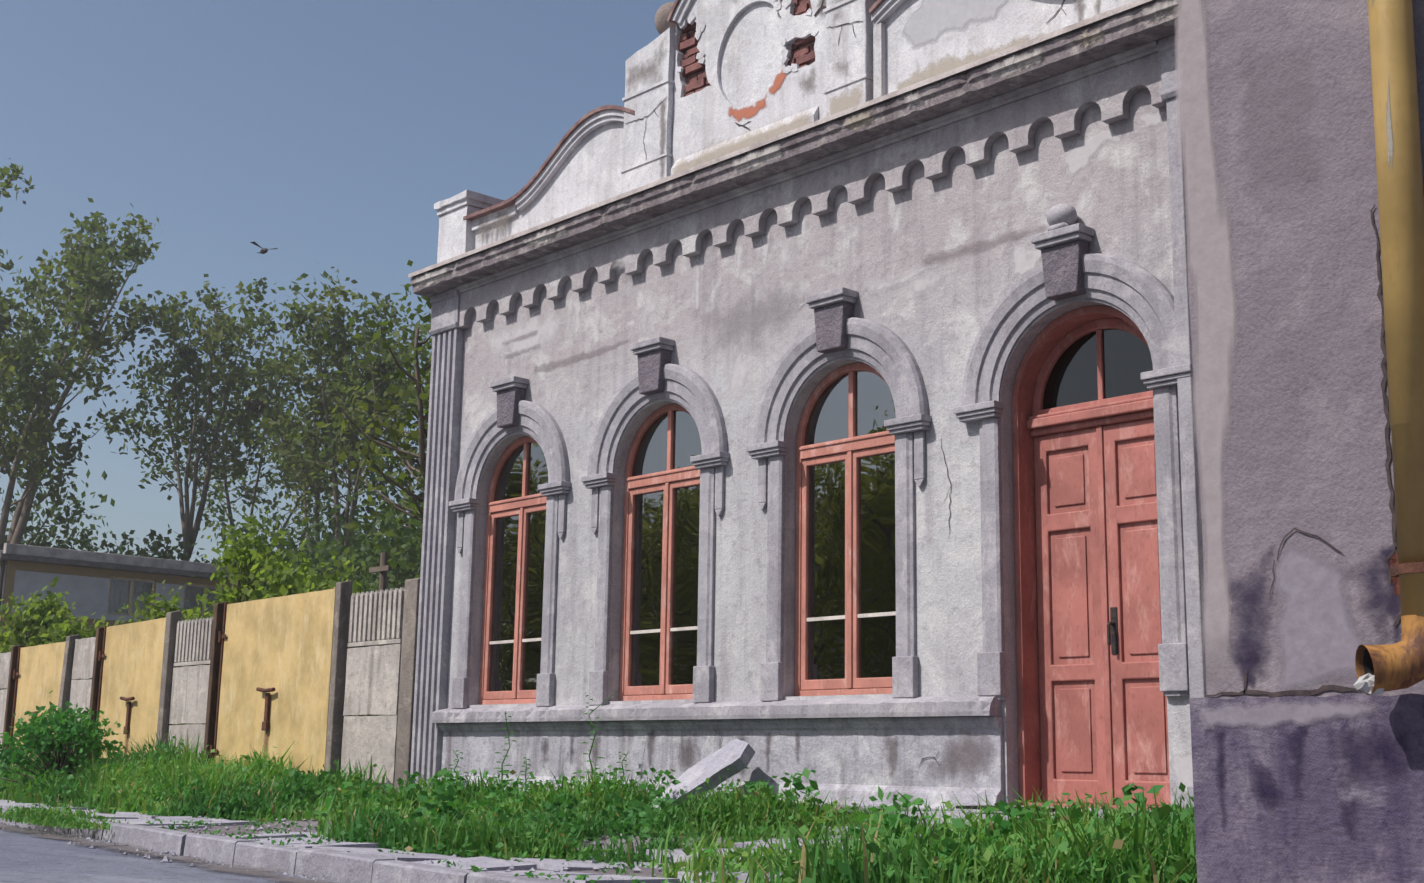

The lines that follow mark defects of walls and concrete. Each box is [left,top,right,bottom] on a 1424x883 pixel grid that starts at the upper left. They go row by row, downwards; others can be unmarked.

spalling [676,13,711,97]
spalling [729,0,819,121]
crack [1370,205,1401,627]
crack [1269,528,1343,598]
water stain [1239,584,1263,683]
water stain [946,738,989,771]
water stain [1254,768,1276,808]
water stain [1203,701,1375,787]